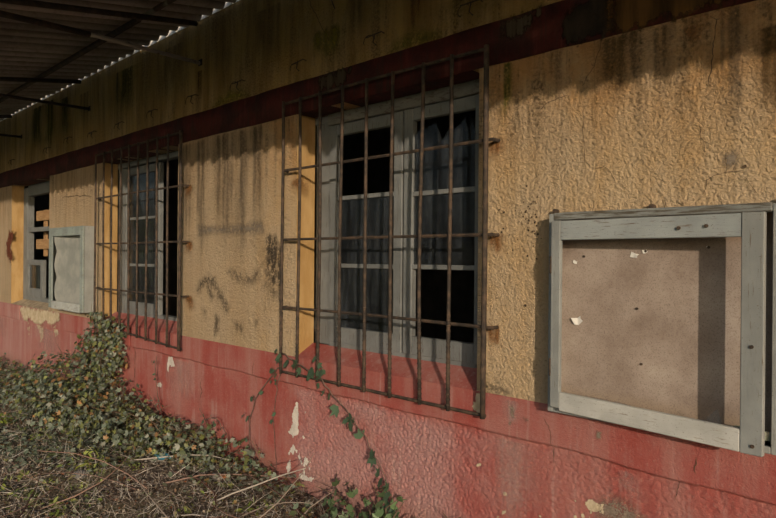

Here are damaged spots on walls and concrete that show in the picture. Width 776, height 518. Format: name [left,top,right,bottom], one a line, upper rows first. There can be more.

peeling [561,0,615,45]
water stain [199,223,280,291]
spalling [20,305,60,343]
peeling [286,402,316,482]
spalling [574,499,604,518]